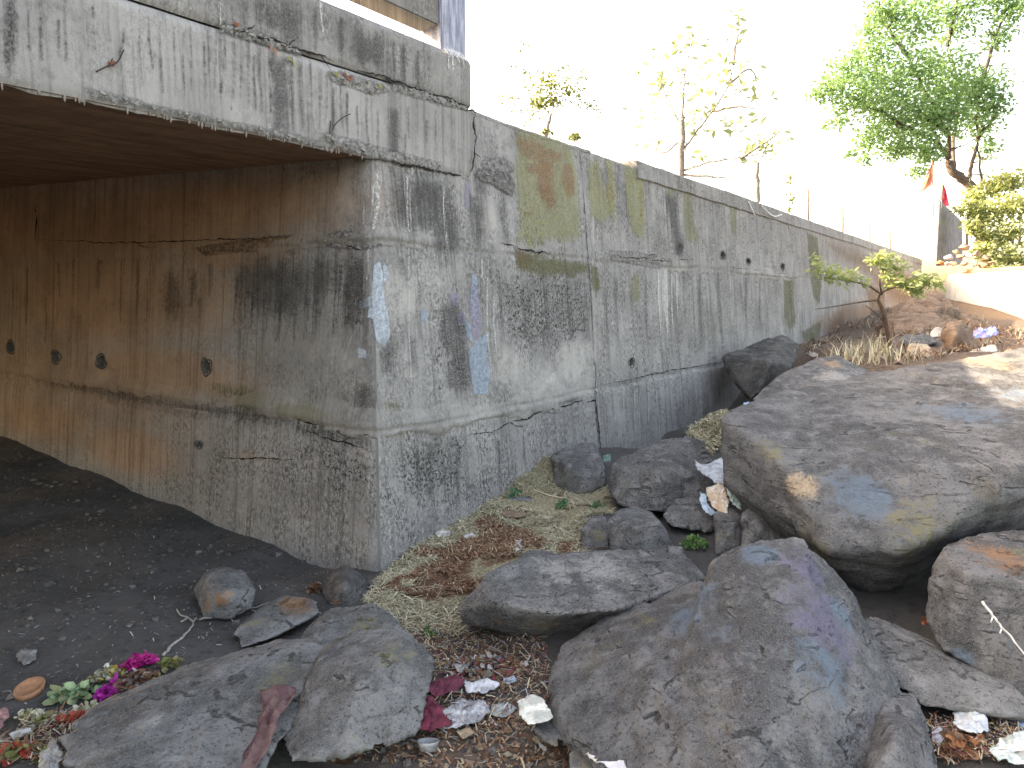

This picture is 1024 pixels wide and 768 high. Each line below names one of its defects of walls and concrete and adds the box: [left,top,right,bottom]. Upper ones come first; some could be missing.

spalling [85,88,442,173]
crack [360,71,480,181]
crack [31,206,290,248]
crack [500,242,549,254]
damp [668,190,683,256]
damp [807,232,822,301]
damp [658,268,678,333]
crack [300,419,368,448]
crack [470,363,713,448]